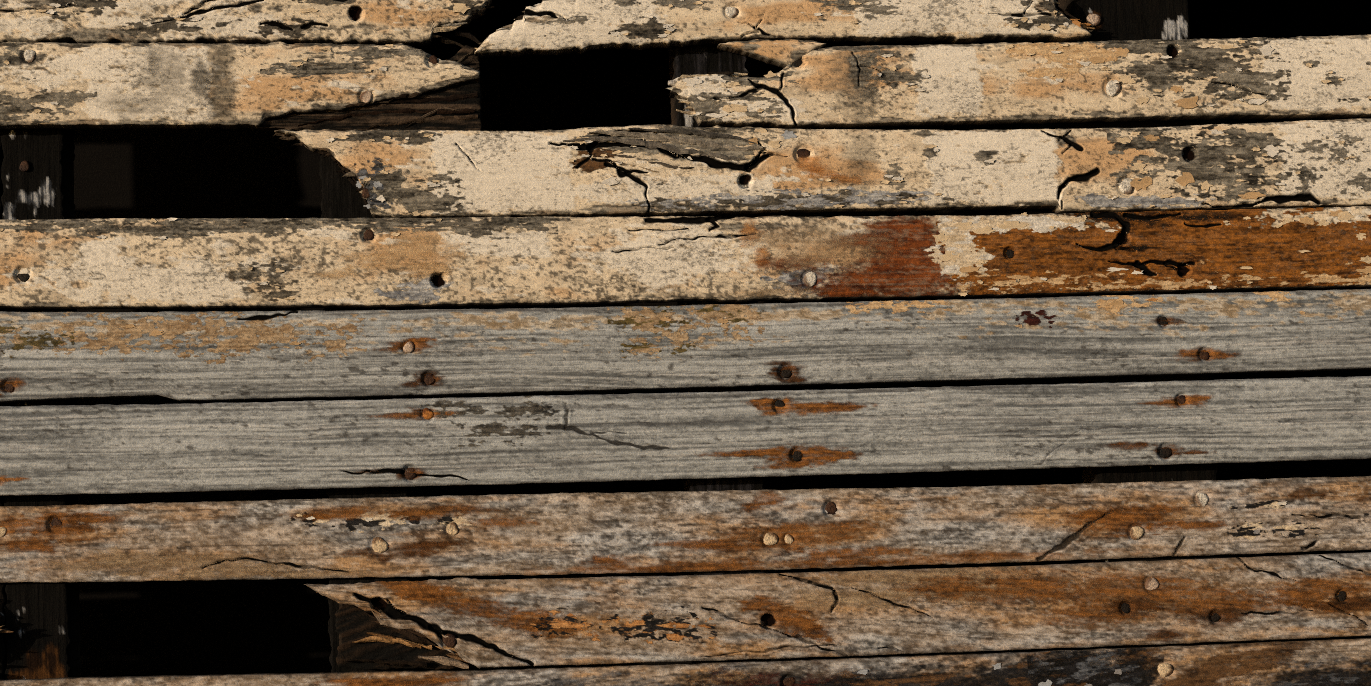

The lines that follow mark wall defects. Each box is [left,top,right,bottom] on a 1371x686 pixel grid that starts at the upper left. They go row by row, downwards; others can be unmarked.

crack [151,0,347,31]
peeling [121,0,433,80]
peeling [0,42,97,125]
crack [550,73,797,253]
peeling [568,64,799,186]
peeling [626,0,1371,328]
crack [1042,130,1320,276]
rust [0,379,23,396]
rust [750,362,866,415]
rust [1144,396,1210,407]
rust [714,446,861,469]
crack [202,557,534,666]